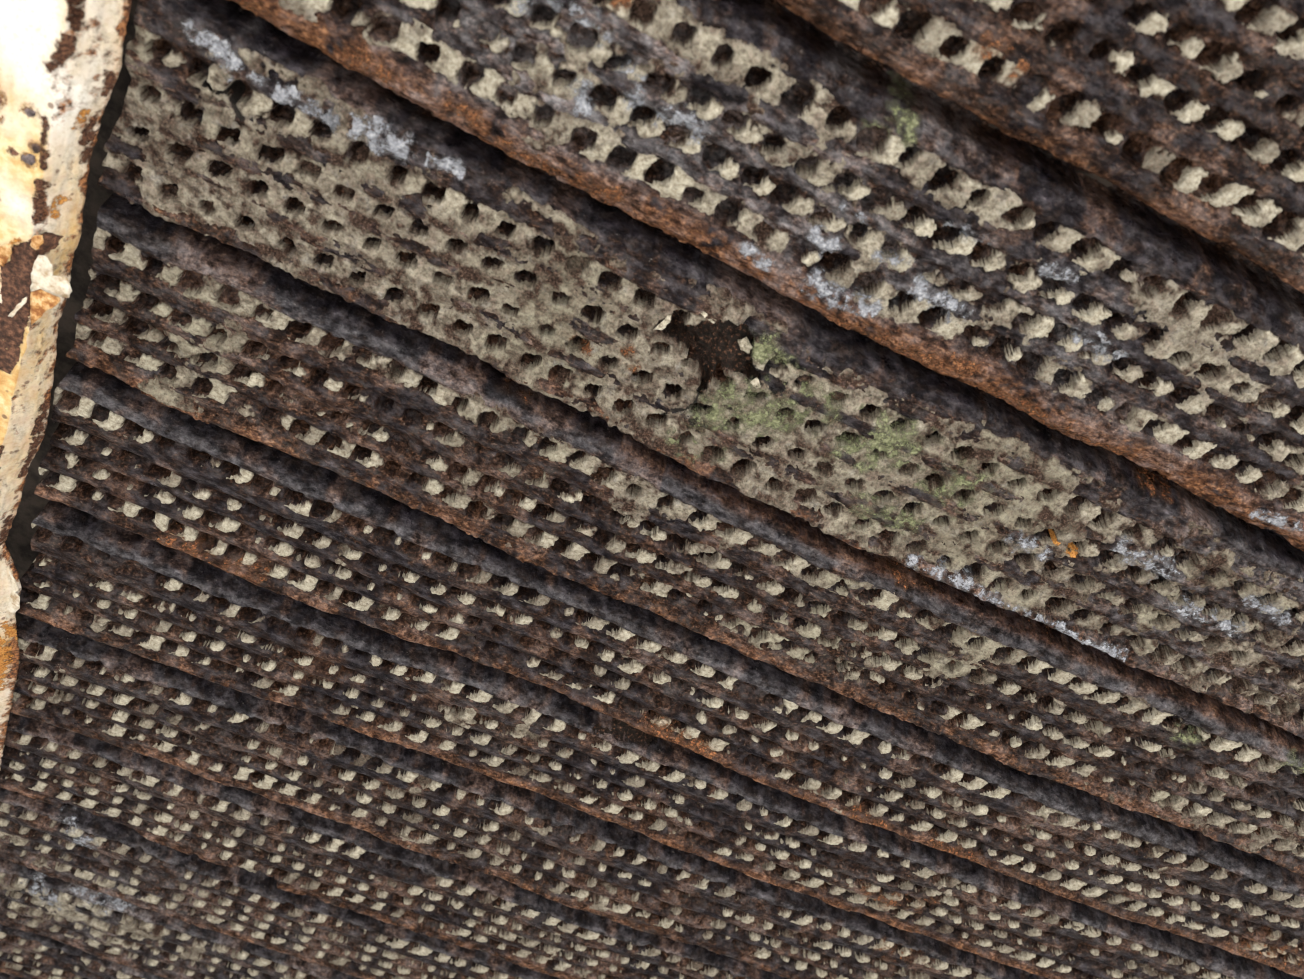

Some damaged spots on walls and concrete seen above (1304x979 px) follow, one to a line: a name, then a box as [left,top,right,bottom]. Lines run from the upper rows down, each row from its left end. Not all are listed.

corrosion [45,0,86,73]
corrosion [101,70,117,97]
corrosion [0,92,71,225]
corrosion [72,109,100,164]
peeling [0,232,72,374]
corrosion [18,402,51,478]
corrosion [828,317,1173,502]
corrosion [0,514,13,546]
corrosion [156,522,270,585]
corrosion [1048,529,1079,558]
corrosion [0,621,18,691]
corrosion [592,711,717,759]